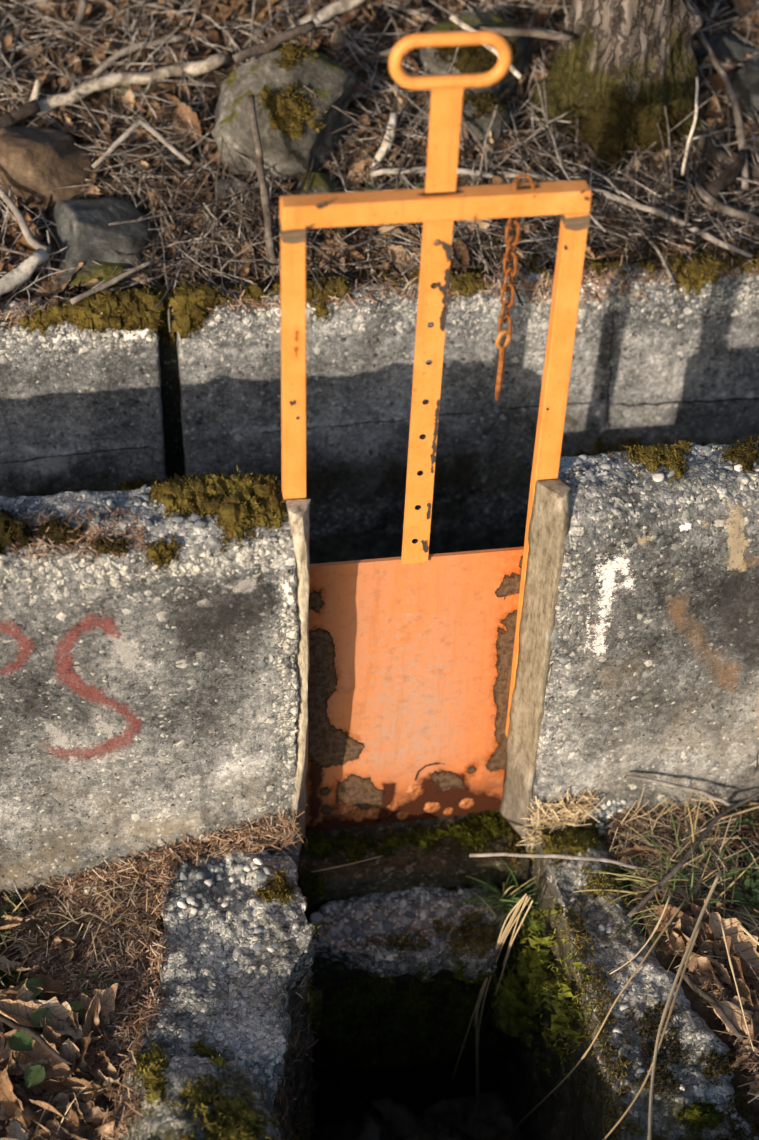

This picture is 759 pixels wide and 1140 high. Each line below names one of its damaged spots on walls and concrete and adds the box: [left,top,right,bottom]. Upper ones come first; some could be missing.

rust [305,759,502,833]